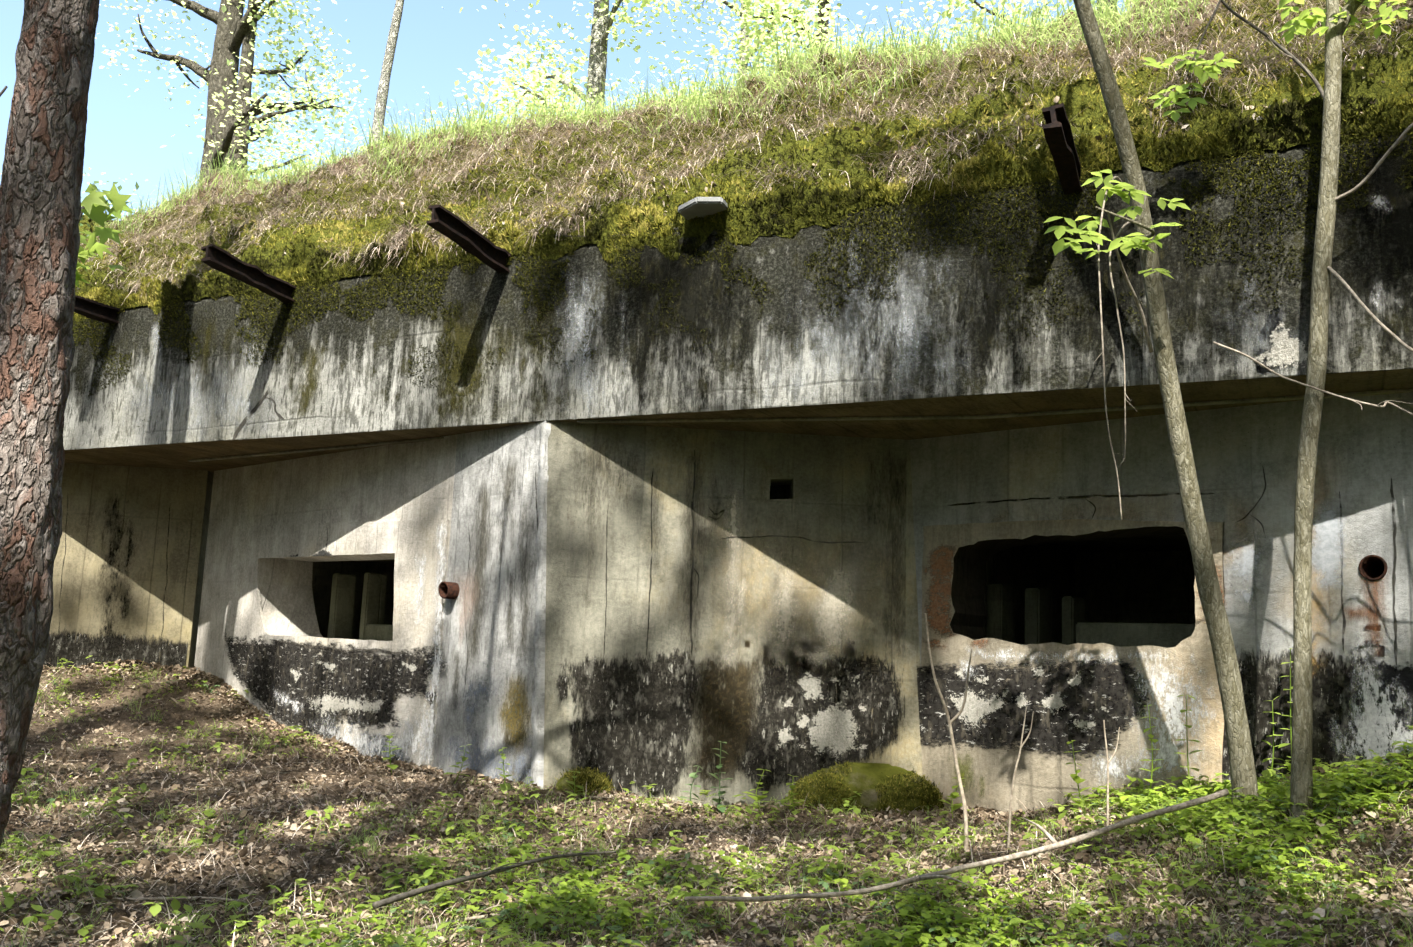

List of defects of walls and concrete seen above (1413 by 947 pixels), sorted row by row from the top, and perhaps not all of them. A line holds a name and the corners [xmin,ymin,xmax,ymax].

water stain [606,234,750,410]
water stain [847,275,919,374]
water stain [953,249,1036,383]
water stain [1048,208,1150,376]
water stain [1149,186,1240,340]
water stain [1330,140,1413,362]
water stain [100,499,133,639]
water stain [321,464,530,764]
crack [948,493,1214,518]
crack [1235,468,1266,538]
crack [1389,478,1397,665]
water stain [1336,642,1413,762]